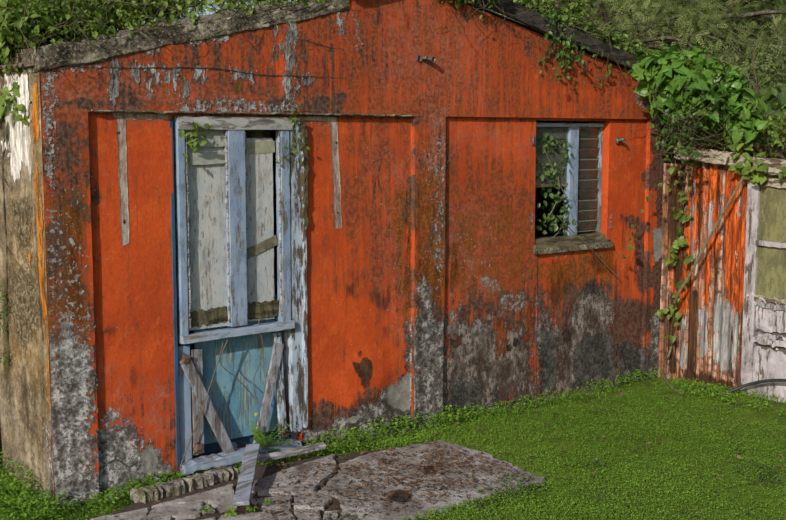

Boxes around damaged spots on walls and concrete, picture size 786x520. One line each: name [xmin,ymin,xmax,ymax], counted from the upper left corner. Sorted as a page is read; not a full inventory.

spalling [1,72,39,359]
water stain [27,167,51,409]
peeling [41,19,314,513]
water stain [447,310,463,348]
water stain [481,275,541,383]
rust [665,165,750,389]